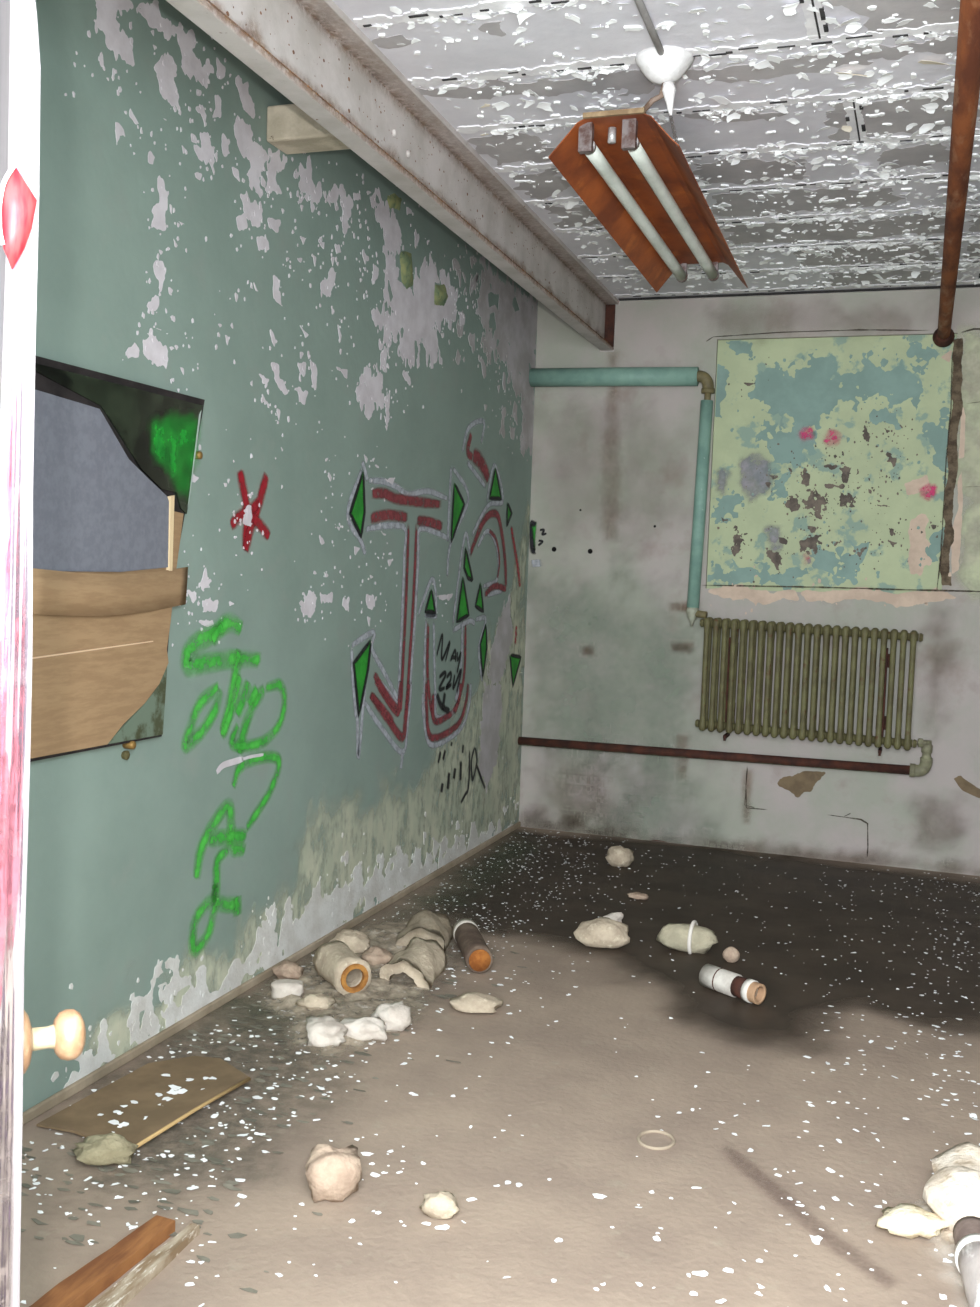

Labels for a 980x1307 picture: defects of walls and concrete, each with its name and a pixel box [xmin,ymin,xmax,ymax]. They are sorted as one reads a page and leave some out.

peeling [74,0,538,461]
peeling [295,455,398,643]
peeling [51,511,905,1089]
damp [548,602,685,743]
damp [436,789,980,1040]
peeling [707,335,980,615]
spalling [954,776,980,798]